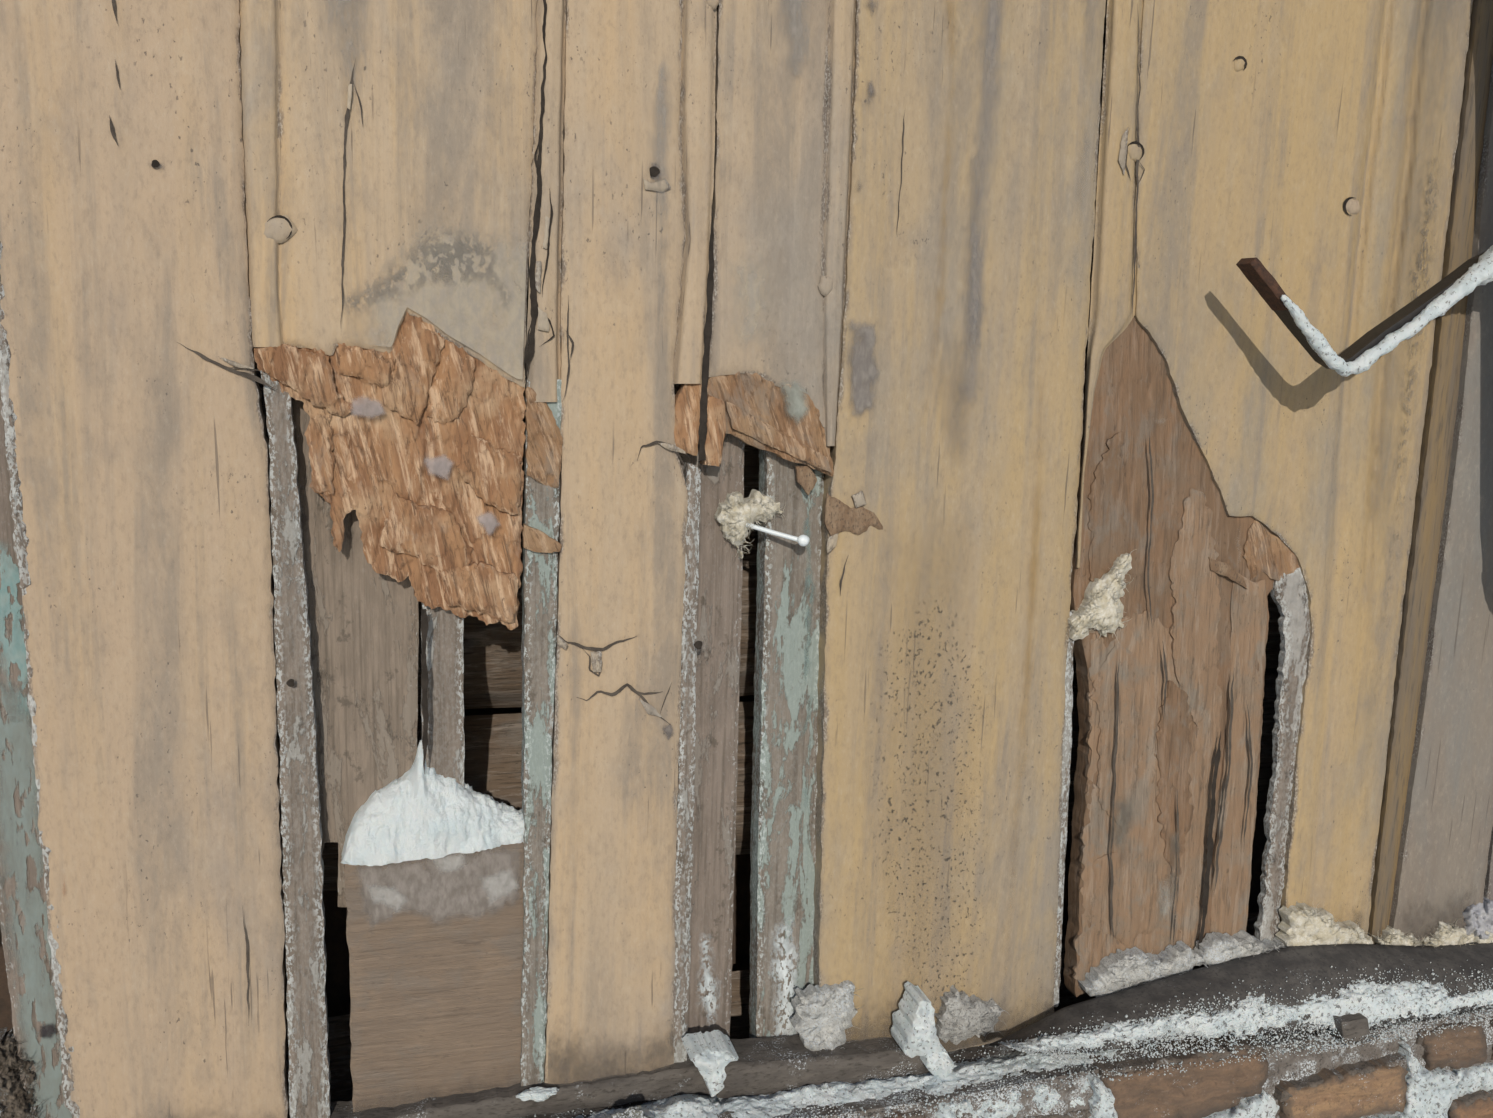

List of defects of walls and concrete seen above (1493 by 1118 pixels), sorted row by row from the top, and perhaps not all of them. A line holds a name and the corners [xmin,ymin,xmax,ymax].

crack [340,60,363,327]
peeling [376,236,563,488]
peeling [522,524,562,553]
peeling [1087,432,1129,582]
peeling [0,551,72,1118]
crack [554,631,672,725]
peeling [1089,488,1221,948]